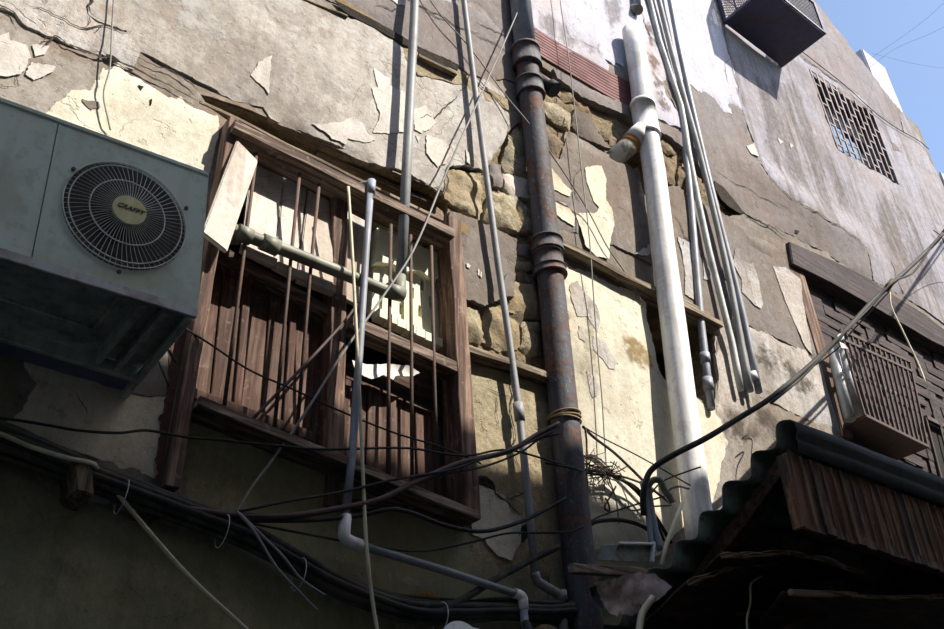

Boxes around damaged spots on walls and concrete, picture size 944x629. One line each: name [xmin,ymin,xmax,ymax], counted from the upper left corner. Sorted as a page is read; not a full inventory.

peeling [0,32,57,80]
peeling [82,99,100,110]
crack [0,0,199,102]
peeling [251,55,272,94]
spalling [335,1,459,71]
flaking render [202,68,542,358]
peeling [543,88,620,259]
flaking render [660,138,744,213]
peeling [677,237,763,309]
peeling [772,266,812,354]
water stain [624,337,652,368]
peeling [471,476,528,560]